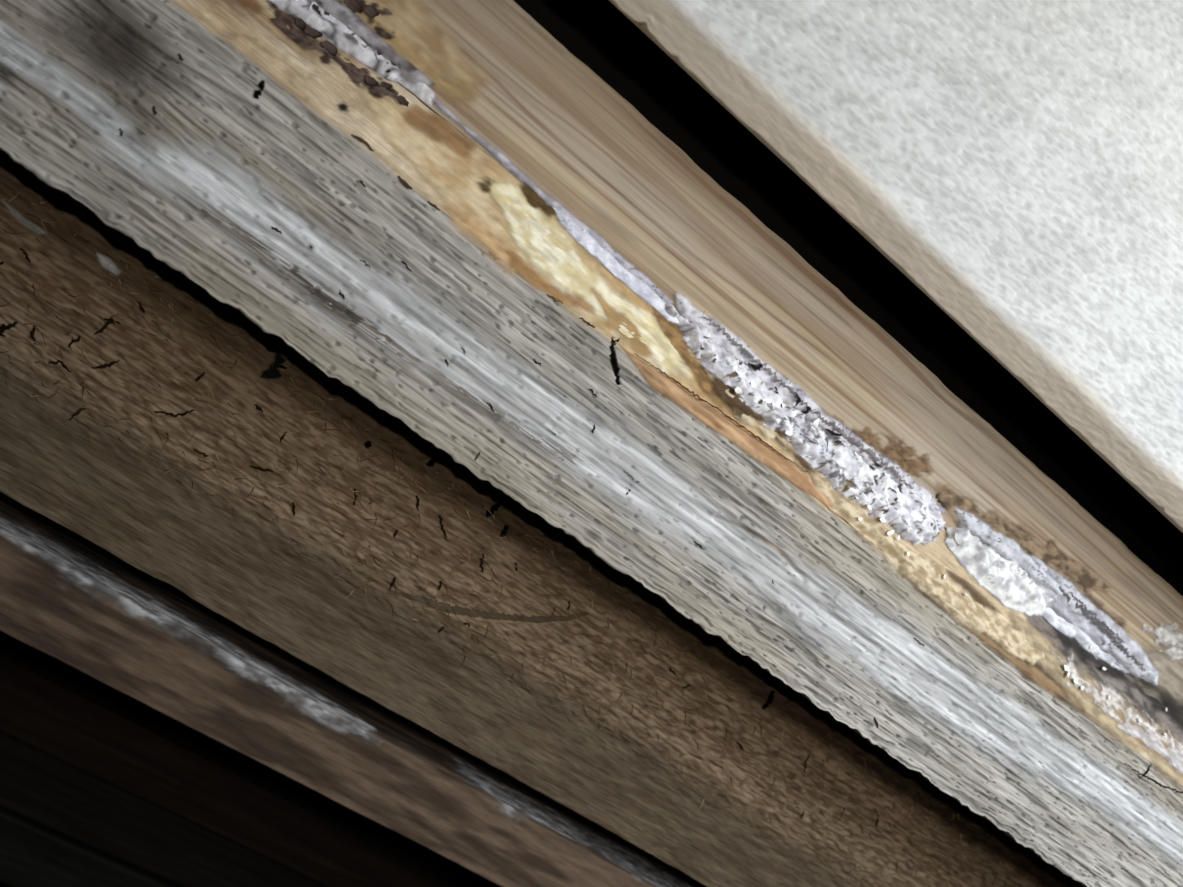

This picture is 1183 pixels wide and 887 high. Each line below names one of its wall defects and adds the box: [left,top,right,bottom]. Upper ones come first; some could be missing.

leakage [0,23,130,135]
peeling [295,17,338,57]
peeling [345,0,379,18]
peeling [365,69,409,107]
leakage [90,114,1183,864]
leakage [0,512,376,740]
leakage [453,757,690,887]